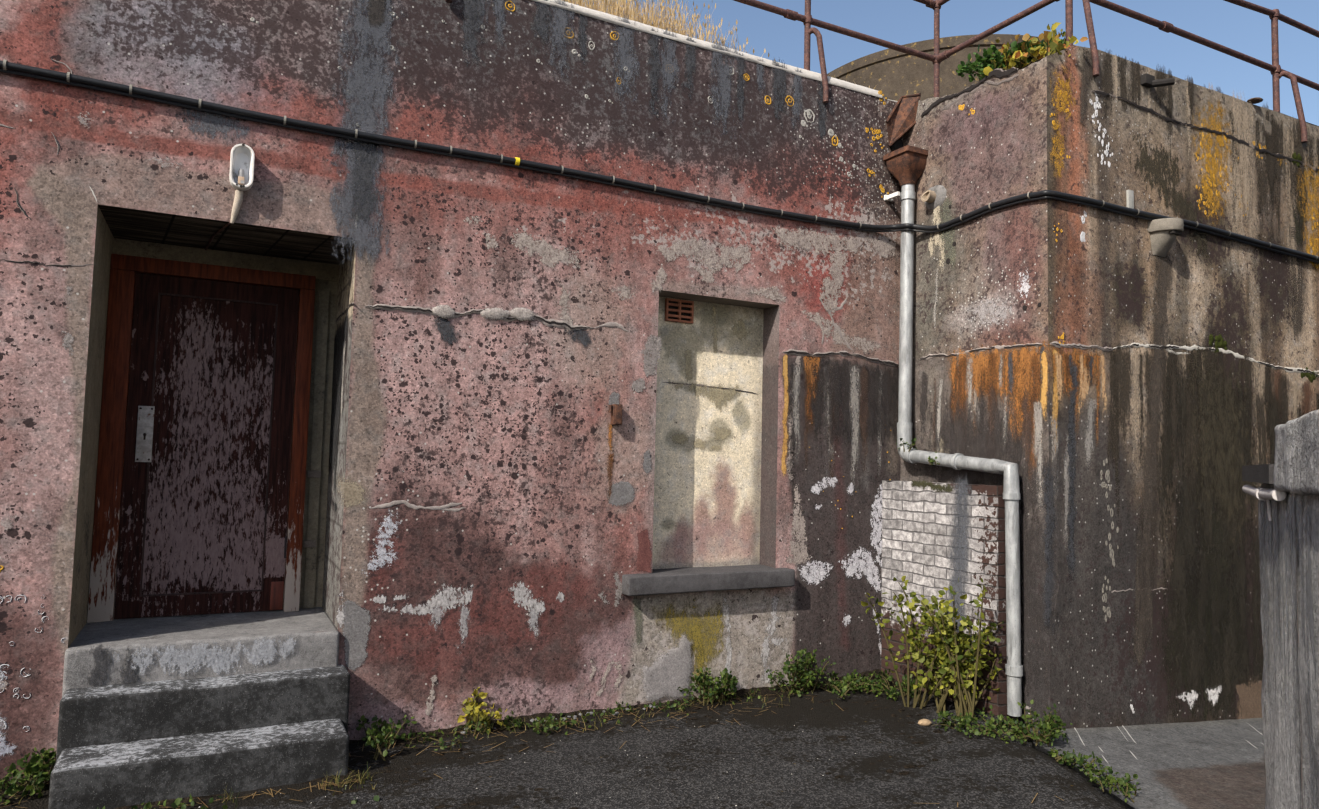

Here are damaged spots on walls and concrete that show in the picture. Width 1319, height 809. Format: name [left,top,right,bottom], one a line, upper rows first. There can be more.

damp [329,0,403,265]
damp [1080,50,1319,338]
crack [2,259,93,267]
crack [335,302,629,332]
crack [782,297,1319,377]
rust [949,341,1107,467]
damp [786,358,899,591]
damp [911,253,1319,808]
peeling [337,584,473,670]
peeling [510,581,564,636]